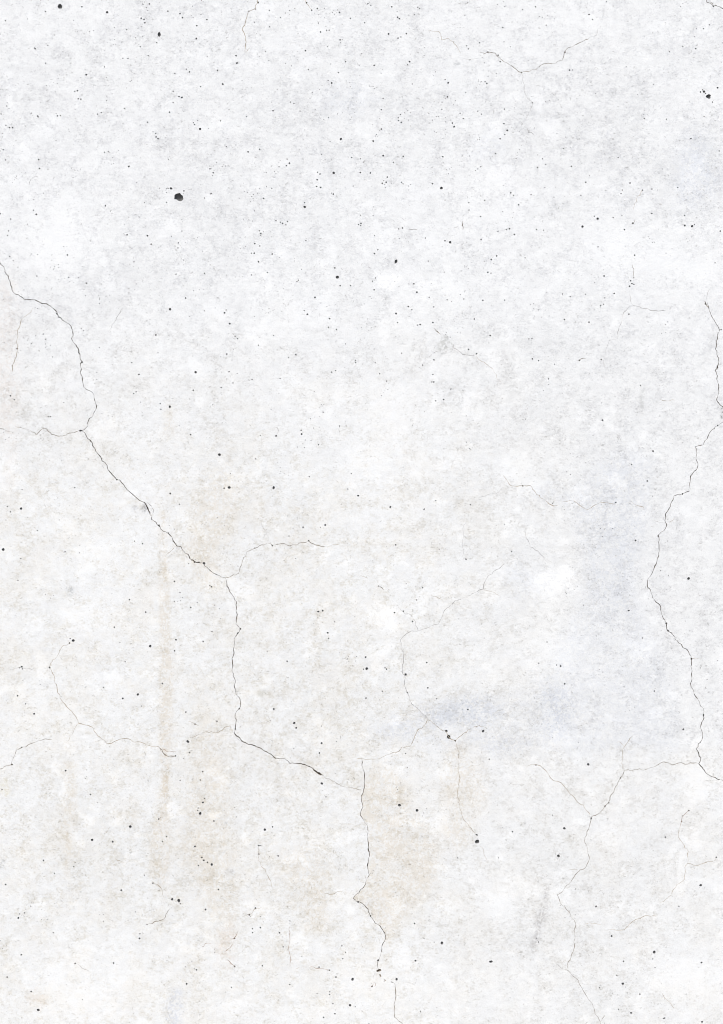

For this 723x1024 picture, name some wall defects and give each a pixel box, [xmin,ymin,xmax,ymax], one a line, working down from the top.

crack [0,263,503,1022]
crack [505,292,723,1021]
crack [580,265,666,367]